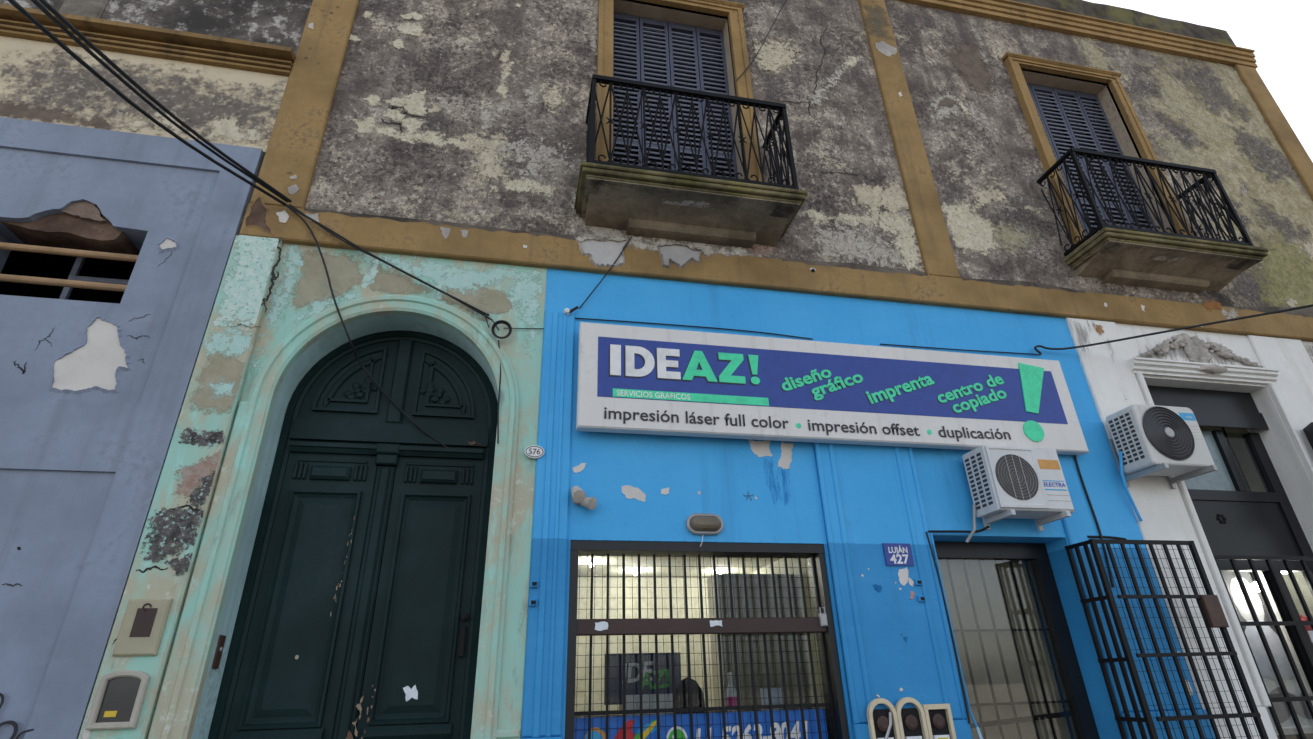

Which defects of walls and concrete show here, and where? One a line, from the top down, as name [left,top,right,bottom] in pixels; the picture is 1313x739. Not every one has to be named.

damp [1154,112,1207,150]
damp [1175,58,1299,184]
damp [304,208,577,240]
peeling [569,217,776,269]
damp [1221,197,1312,241]
damp [782,259,928,276]
damp [962,278,1085,293]
damp [1215,256,1313,317]
flaking render [48,314,135,395]
peeling [142,174,542,576]
peeling [748,439,794,470]
peeling [620,485,670,503]